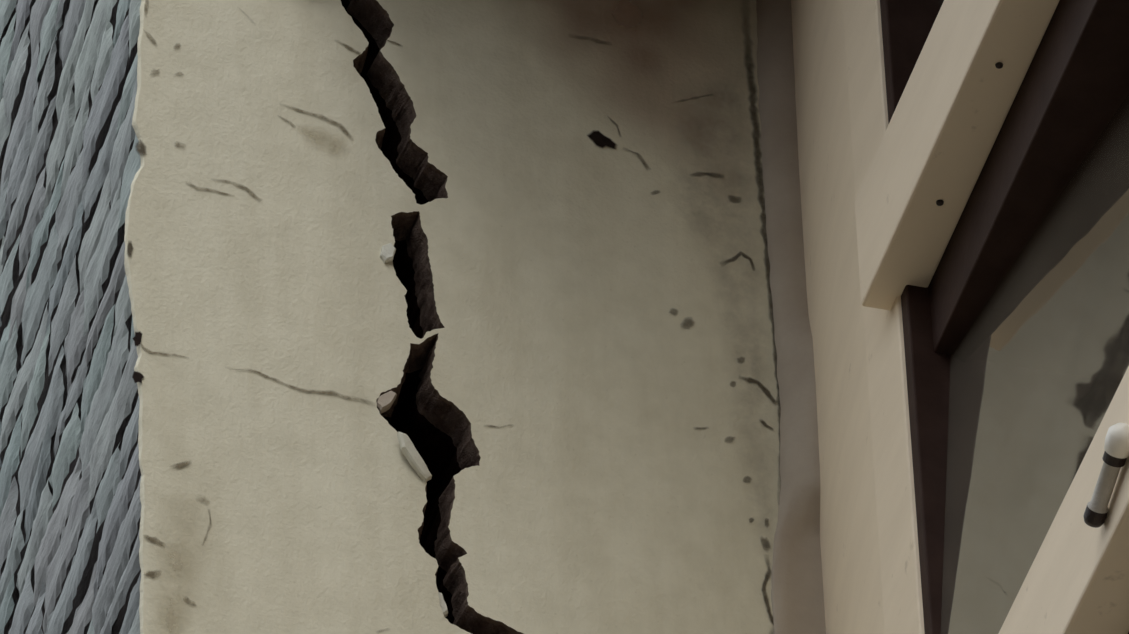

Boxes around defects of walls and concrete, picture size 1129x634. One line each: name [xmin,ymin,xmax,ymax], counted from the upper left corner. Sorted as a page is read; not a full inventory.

crack [143,347,184,357]
crack [252,0,523,634]
crack [746,47,781,437]
crack [762,566,774,625]